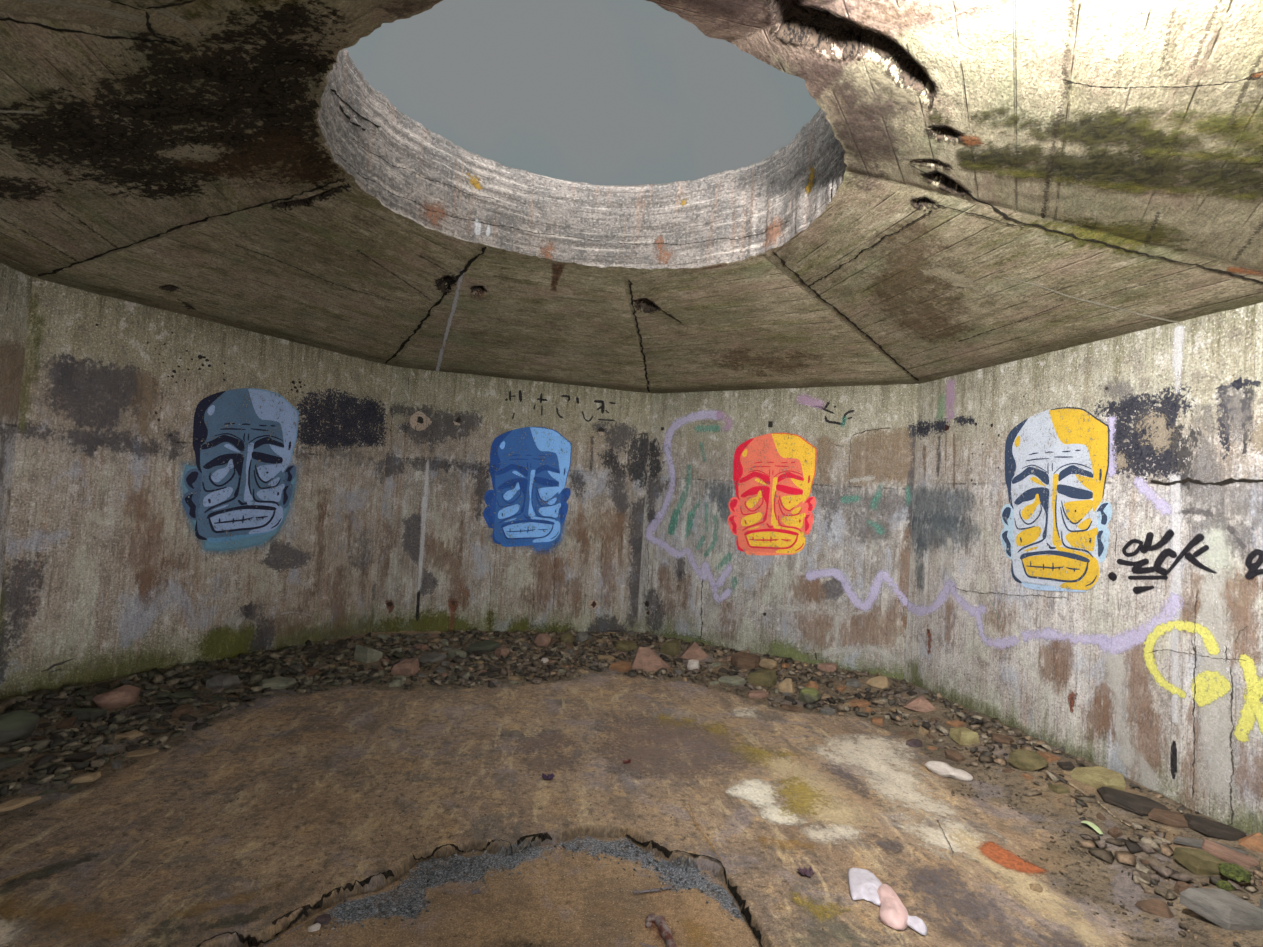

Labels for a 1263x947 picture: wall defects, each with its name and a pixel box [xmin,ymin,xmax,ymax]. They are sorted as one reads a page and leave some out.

crack [0,0,196,47]
damp [0,0,350,202]
spalling [765,0,940,109]
spalling [909,159,969,211]
spalling [925,125,982,146]
damp [957,107,1263,197]
crack [1061,71,1263,89]
crack [38,89,1263,449]
crack [1151,477,1263,486]
crack [196,832,552,947]
crack [626,803,763,947]